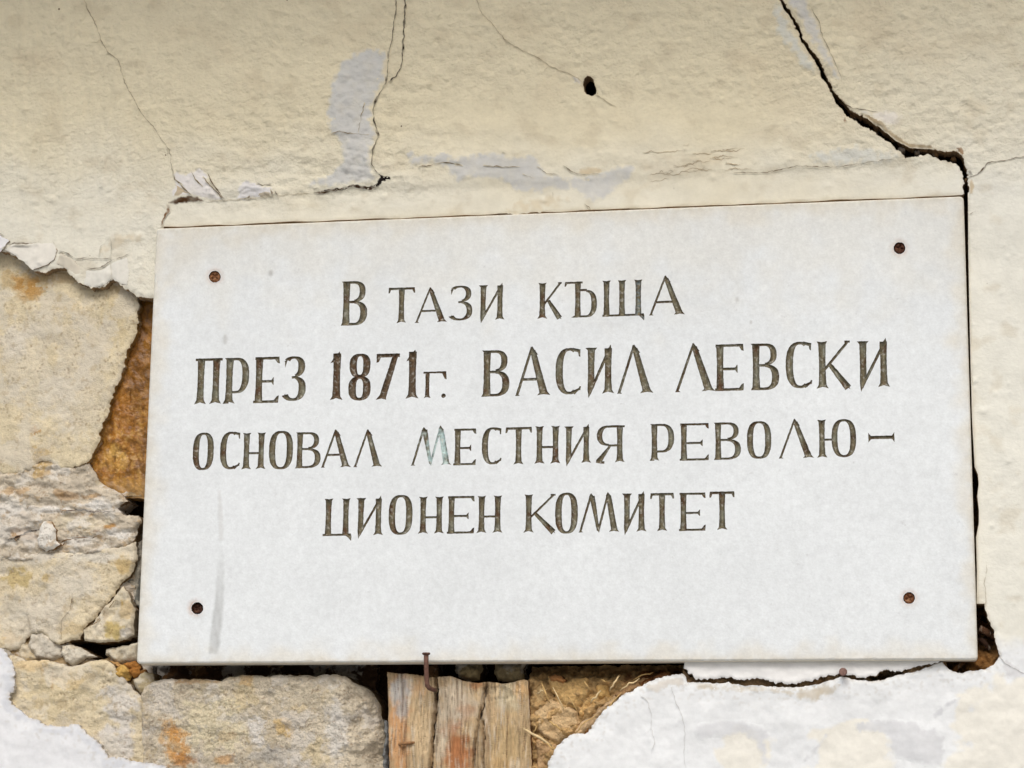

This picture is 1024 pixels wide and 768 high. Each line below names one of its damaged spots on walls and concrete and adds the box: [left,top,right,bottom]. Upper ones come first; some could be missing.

crack [84,0,174,178]
crack [208,0,407,202]
crack [476,0,617,107]
spalling [160,167,278,227]
flaking render [0,233,130,288]
crack [781,2,1024,606]
spalling [37,521,62,552]
peeling [644,676,689,694]